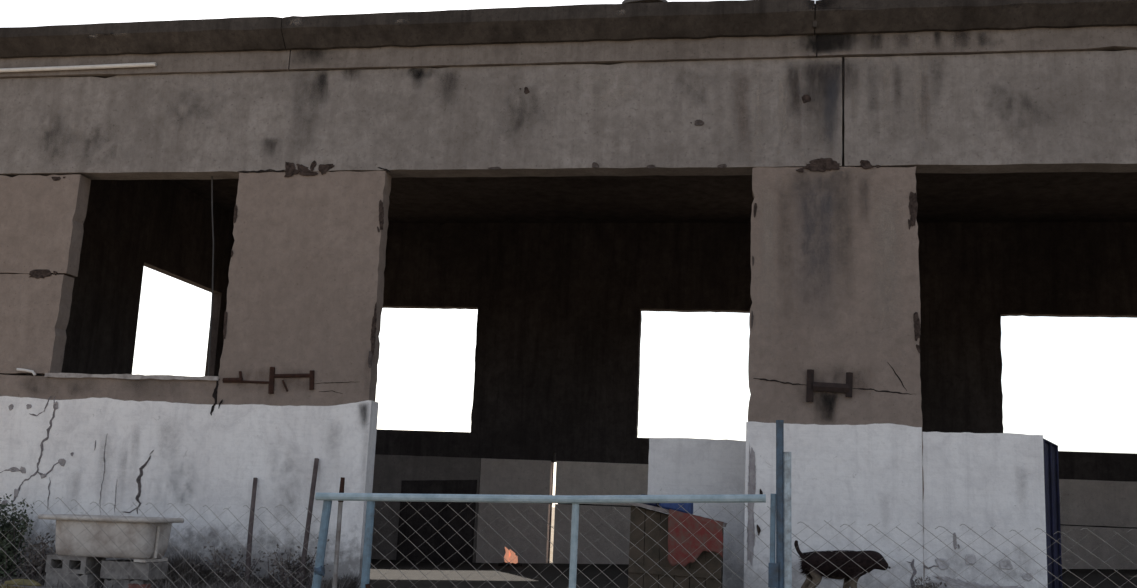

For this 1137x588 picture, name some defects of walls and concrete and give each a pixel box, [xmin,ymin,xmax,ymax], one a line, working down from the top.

spalling [284,160,335,177]
spalling [796,158,840,172]
spalling [29,269,57,279]
crack [210,379,223,415]
crack [753,377,805,385]
crack [852,362,911,395]
crack [0,396,58,510]
crack [94,436,154,514]